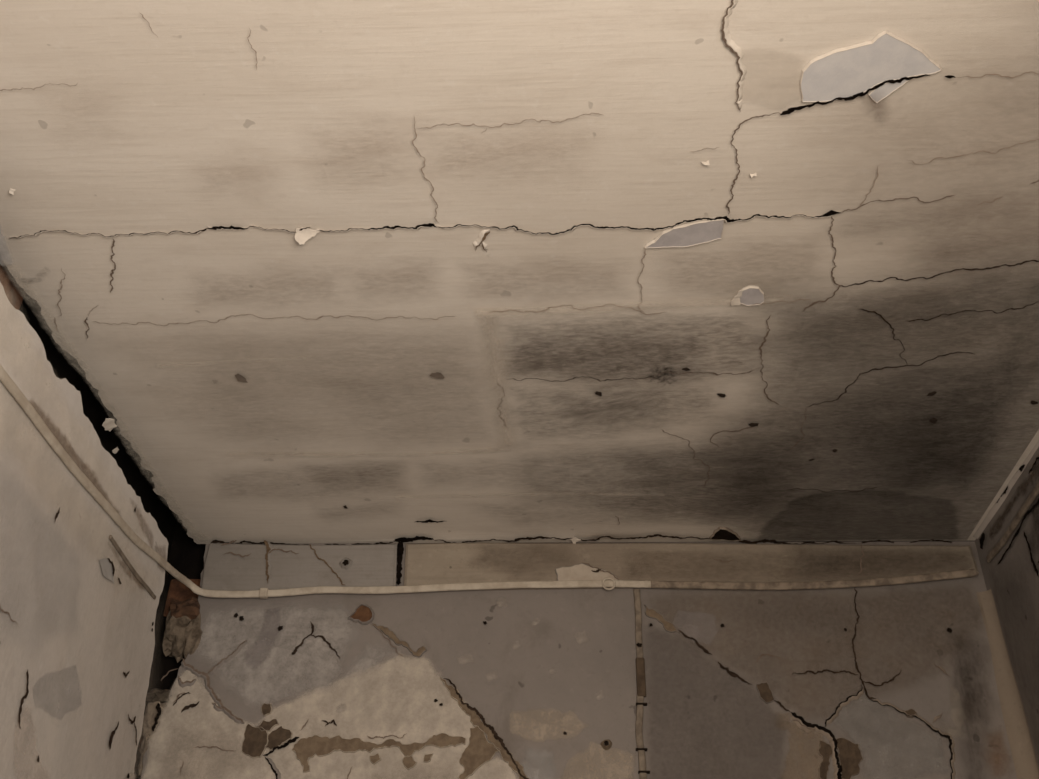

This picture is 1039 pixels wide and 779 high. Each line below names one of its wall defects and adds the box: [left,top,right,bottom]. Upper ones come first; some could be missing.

peeling [799,30,942,103]
crack [10,0,1039,448]
peeling [644,219,724,248]
peeling [730,285,764,306]
crack [996,455,1039,503]
crack [211,516,952,585]
crack [979,498,1039,578]
peeling [200,604,528,779]
crack [679,630,752,685]
crack [774,588,956,779]